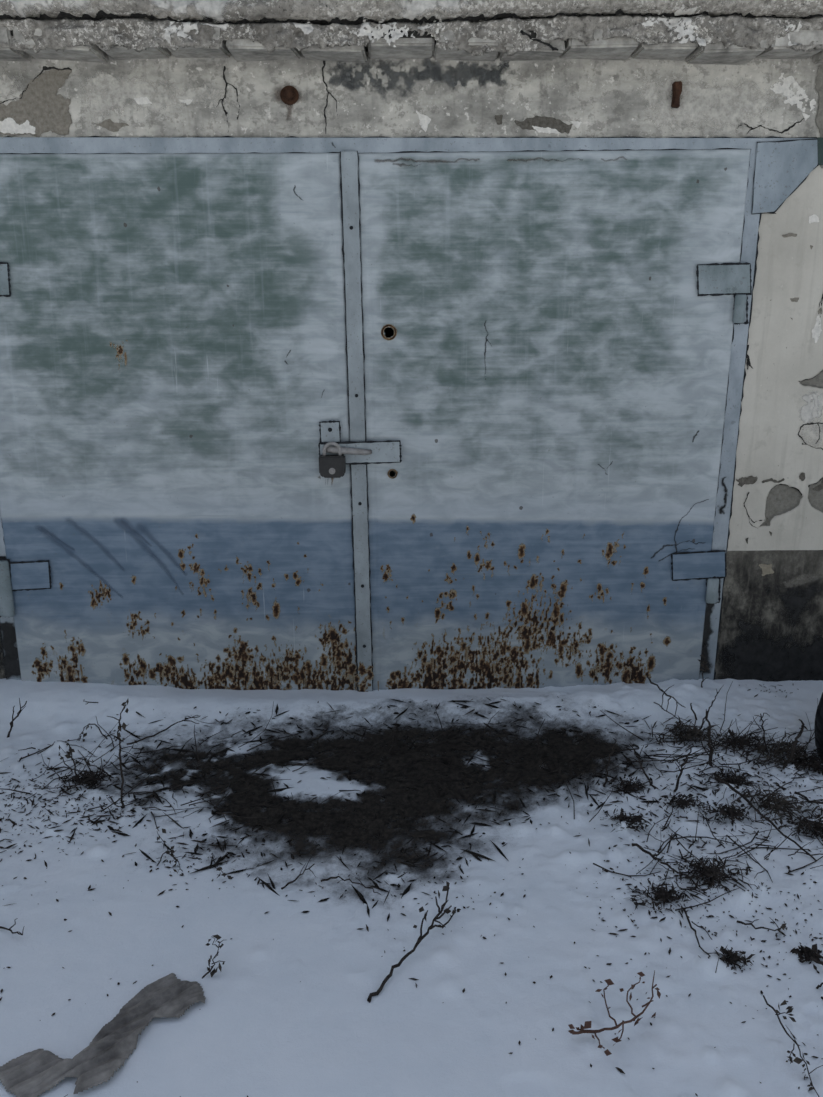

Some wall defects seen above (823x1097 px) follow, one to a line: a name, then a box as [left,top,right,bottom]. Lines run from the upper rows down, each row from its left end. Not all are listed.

peeling [0,66,72,137]
peeling [84,73,220,132]
crack [216,66,240,132]
crack [322,60,338,134]
damp [329,55,512,96]
flaking render [736,473,823,544]
corrosion [88,580,112,610]
corrosion [119,526,671,692]
corrosion [31,630,88,683]